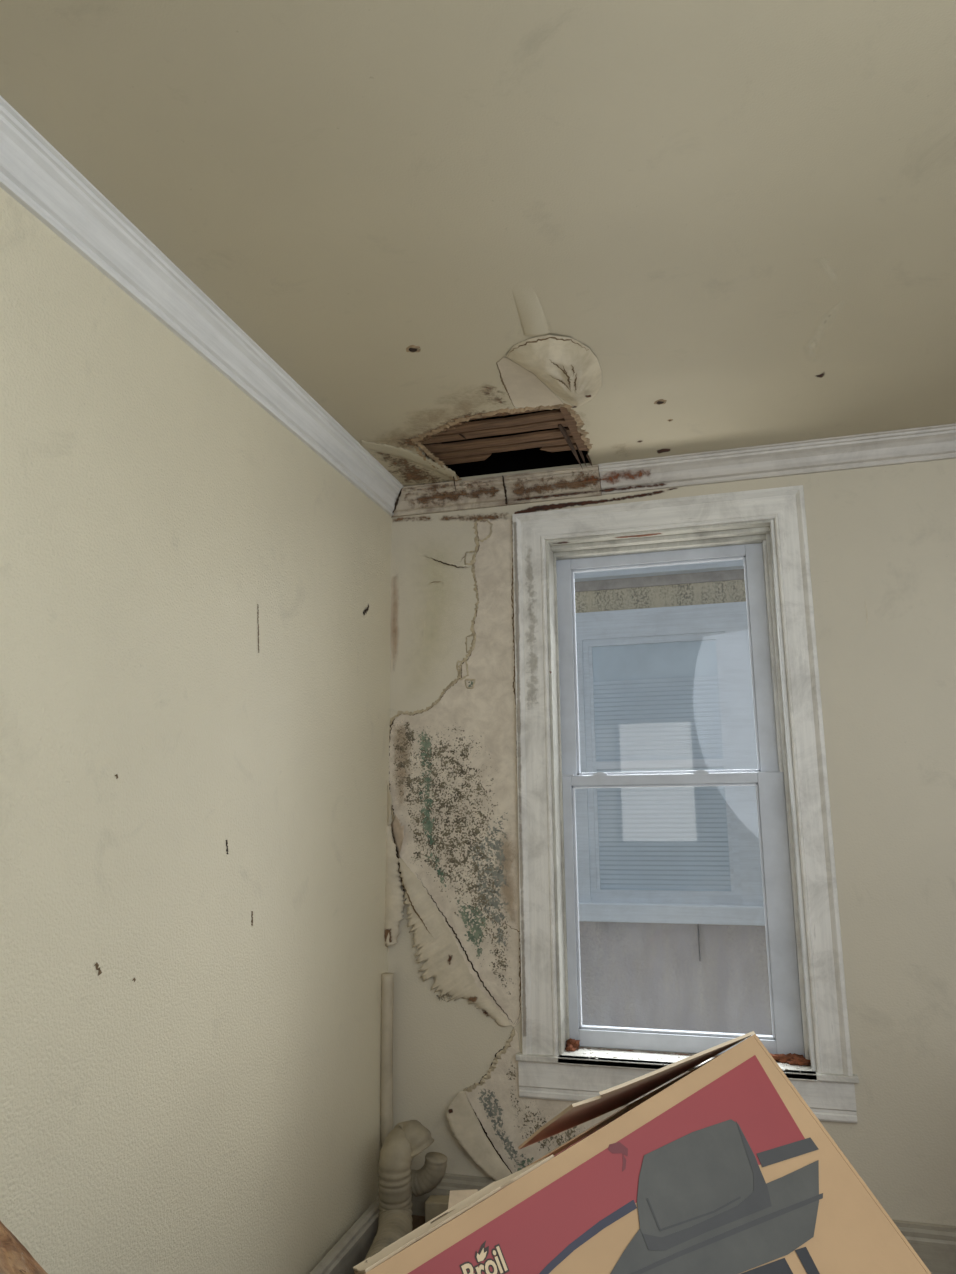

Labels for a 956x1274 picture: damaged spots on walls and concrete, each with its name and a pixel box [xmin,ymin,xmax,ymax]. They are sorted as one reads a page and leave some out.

damp [379,387,601,522]
damp [392,722,514,995]
flaking render [384,519,627,1181]